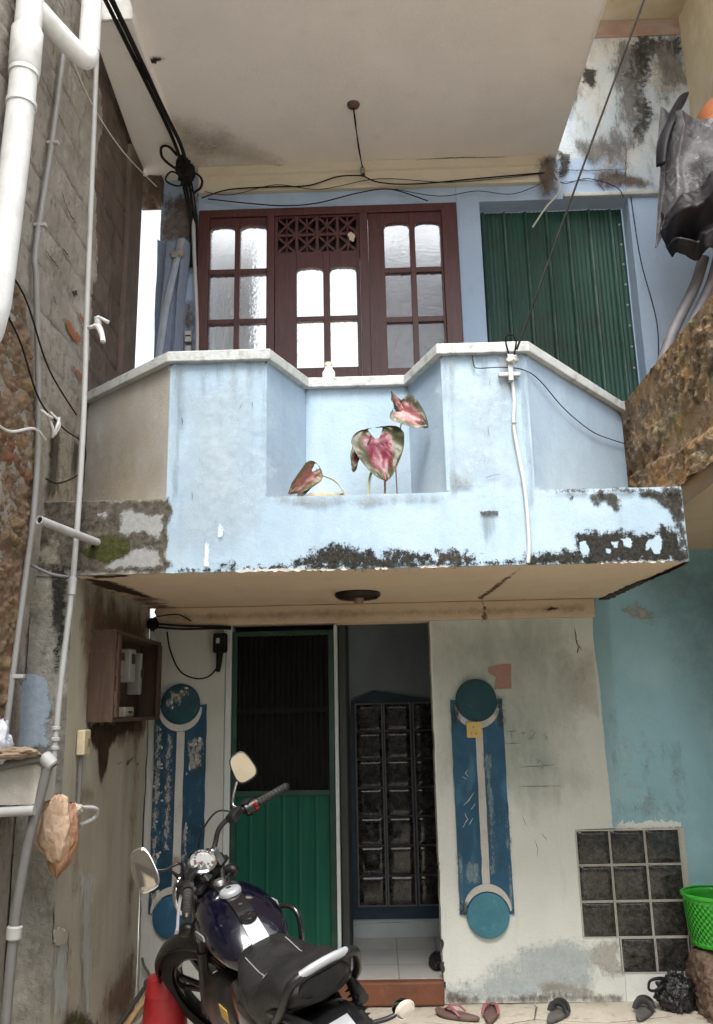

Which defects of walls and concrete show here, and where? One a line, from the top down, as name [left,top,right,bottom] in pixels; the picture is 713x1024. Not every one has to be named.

leakage [557,35,687,177]
flaking render [84,509,163,601]
leakage [38,421,689,671]